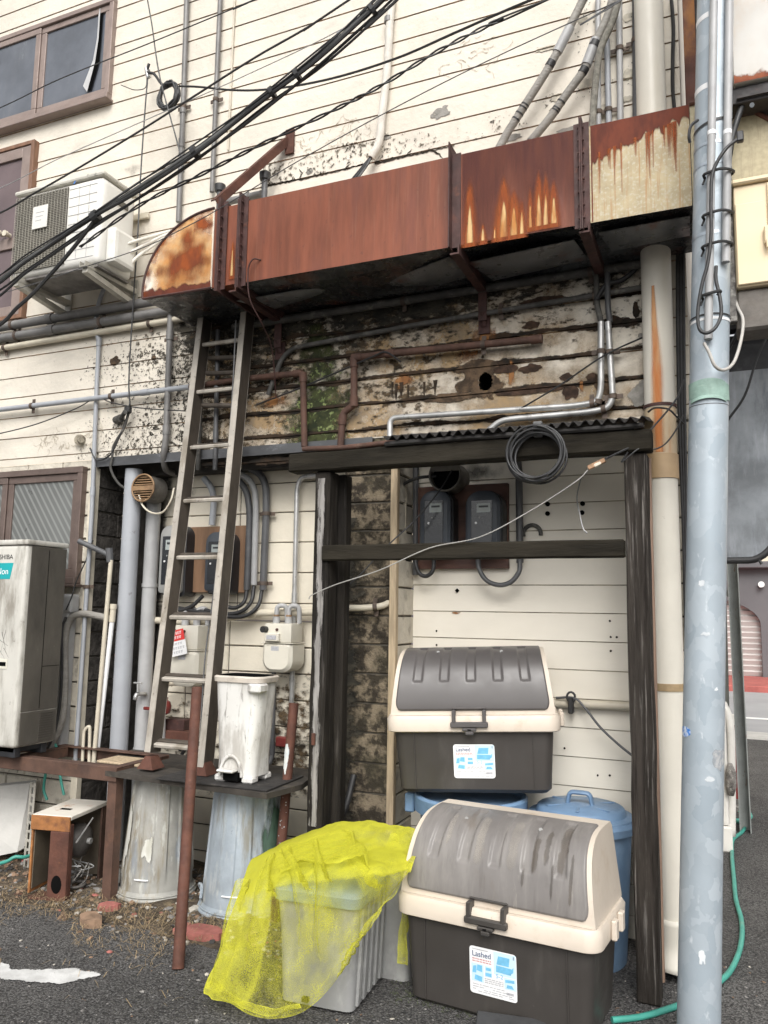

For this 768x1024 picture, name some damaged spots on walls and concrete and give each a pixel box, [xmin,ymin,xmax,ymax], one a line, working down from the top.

corrosion [462,130,574,248]
corrosion [590,105,689,222]
corrosion [143,213,212,297]
leakage [78,322,197,460]
leakage [201,320,240,450]
leakage [243,271,642,446]
spalling [424,359,609,403]
spalling [522,321,540,329]
peeling [627,380,644,407]
corrosion [652,285,663,452]